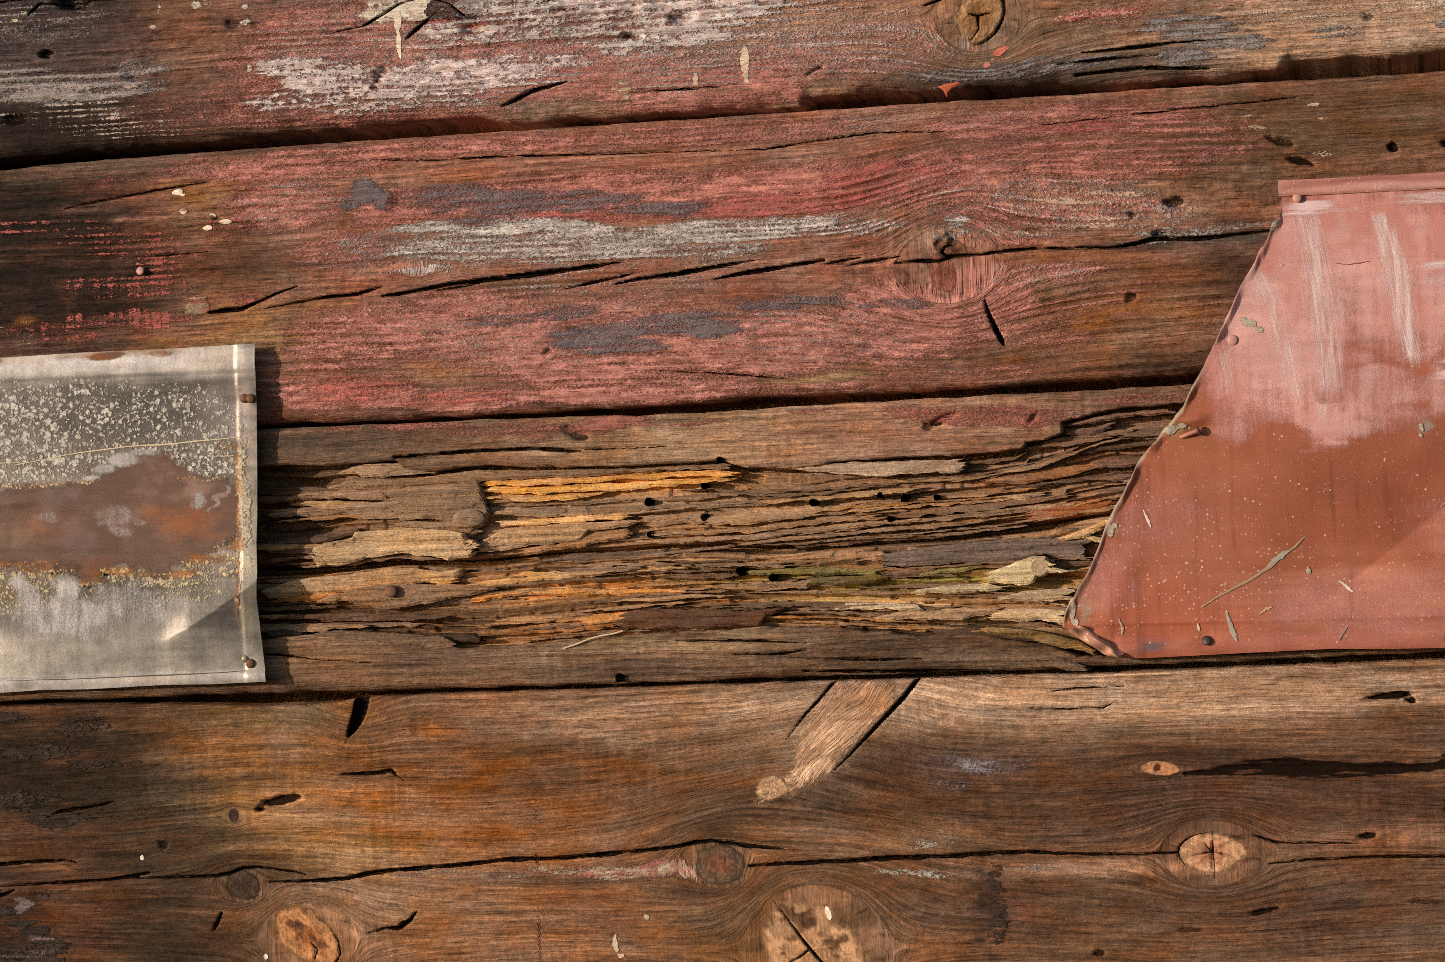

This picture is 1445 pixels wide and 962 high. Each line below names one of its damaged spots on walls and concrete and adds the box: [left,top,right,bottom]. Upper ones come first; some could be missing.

crack [332,0,476,42]
spalling [1288,144,1334,166]
peeling [87,0,1271,444]
peeling [0,216,200,342]
crack [208,230,1270,313]
rust [90,351,124,360]
rust [0,376,256,617]
peeling [1069,601,1079,625]
crack [677,639,990,768]
crack [0,833,1445,897]
crack [311,911,417,961]
crack [773,900,822,962]